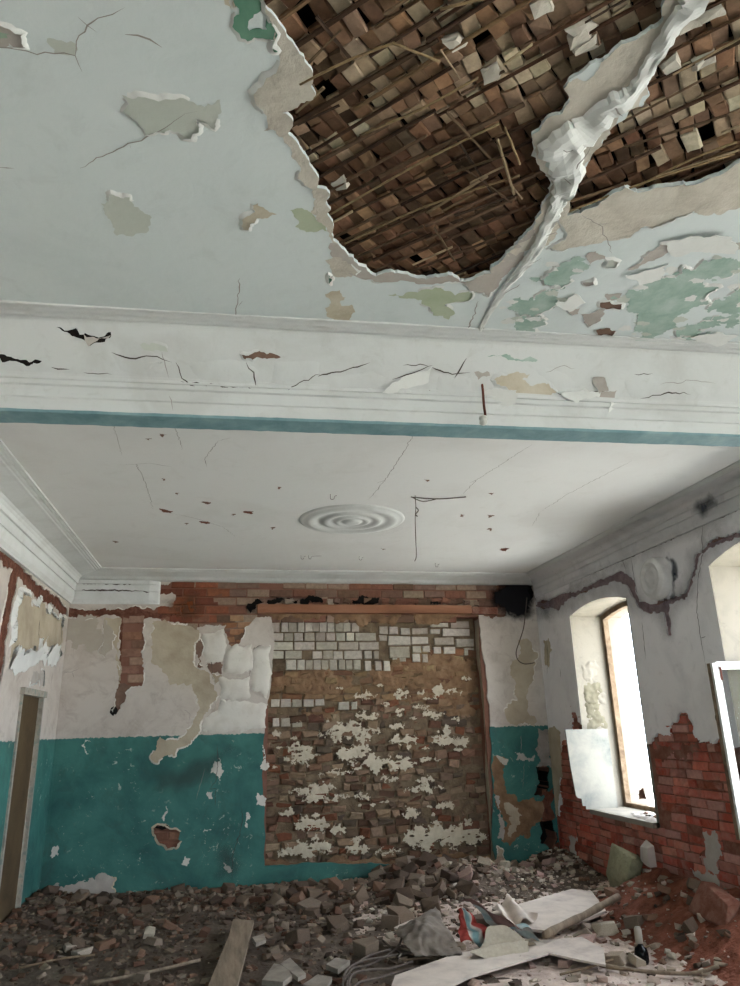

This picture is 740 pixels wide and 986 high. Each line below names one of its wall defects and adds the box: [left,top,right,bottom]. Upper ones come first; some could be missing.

crack [0,10,161,71]
crack [82,111,197,168]
peeling [120,90,222,142]
flaking render [224,0,740,347]
peeling [102,190,152,237]
crack [292,363,368,387]
flaking render [383,367,432,396]
flaking render [474,354,622,413]
flaking render [0,551,506,765]
flaking render [491,636,740,890]
flaking render [151,806,190,866]